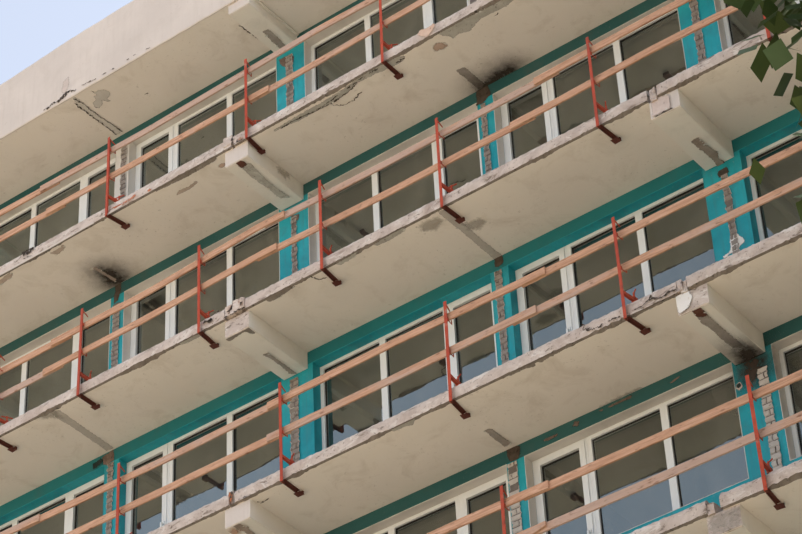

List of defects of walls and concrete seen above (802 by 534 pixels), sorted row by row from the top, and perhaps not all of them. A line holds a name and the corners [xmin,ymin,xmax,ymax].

crack [44,89,123,135]
crack [281,68,378,128]
peeling [691,138,723,166]
flaking render [721,173,744,258]